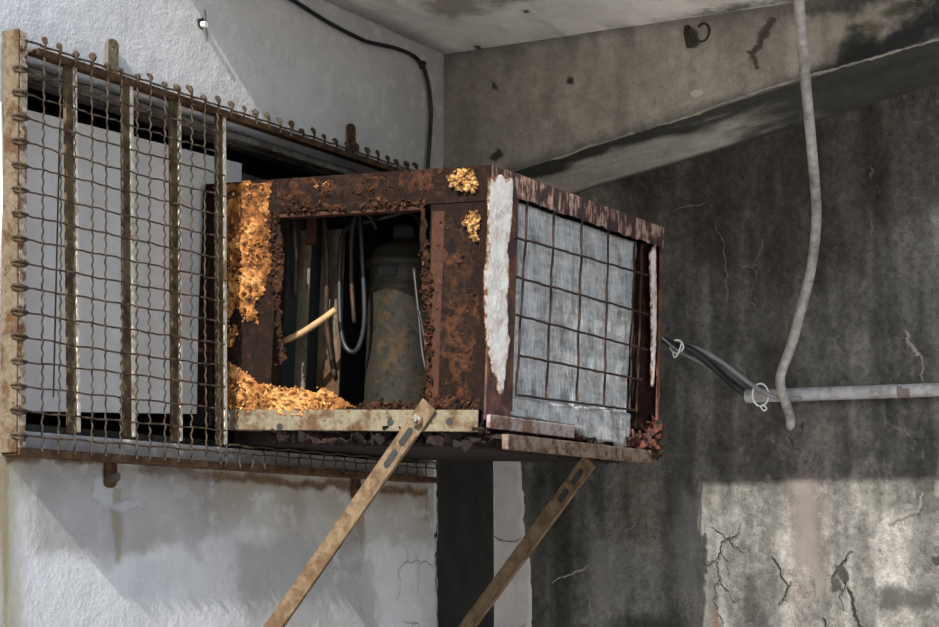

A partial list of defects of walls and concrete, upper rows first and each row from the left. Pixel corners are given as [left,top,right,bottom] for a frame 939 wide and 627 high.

damp [819,0,939,71]
damp [92,476,143,513]
crack [396,552,434,626]
crack [702,522,742,627]
crack [772,555,792,605]
crack [823,550,864,627]
damp [880,586,939,609]